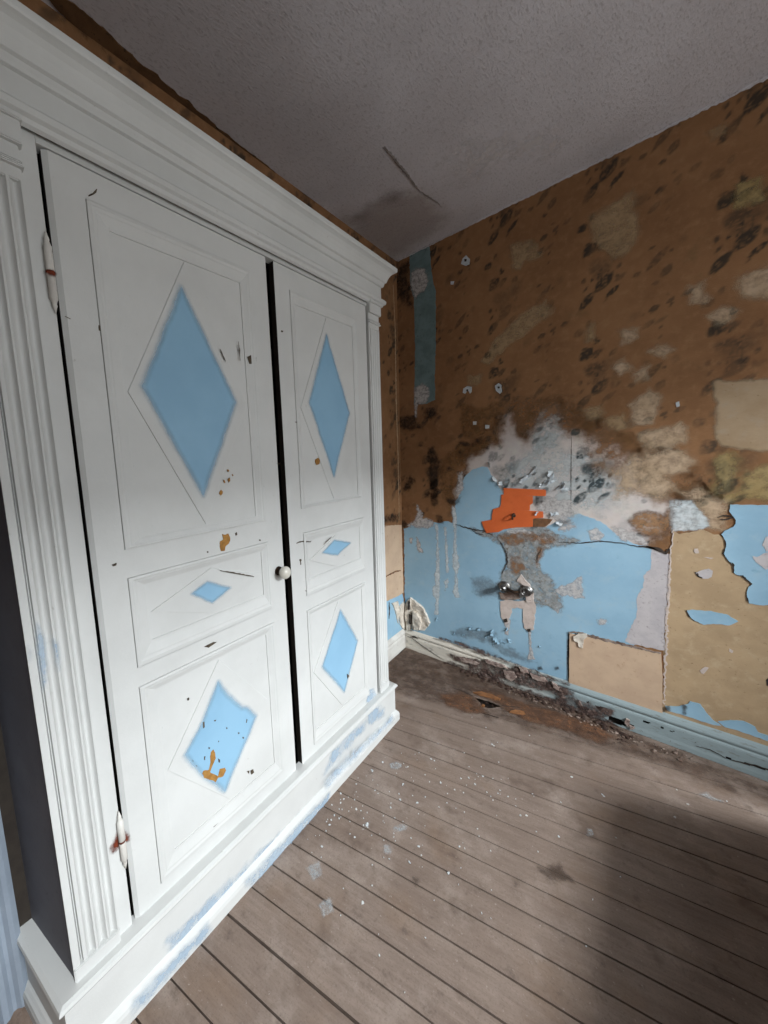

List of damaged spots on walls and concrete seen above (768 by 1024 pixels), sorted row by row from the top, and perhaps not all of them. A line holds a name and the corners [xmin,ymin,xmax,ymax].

crack [383,146,440,205]
flaking render [384,505,434,601]
crack [456,524,508,573]
damp [426,398,706,615]
flaking render [453,466,768,746]